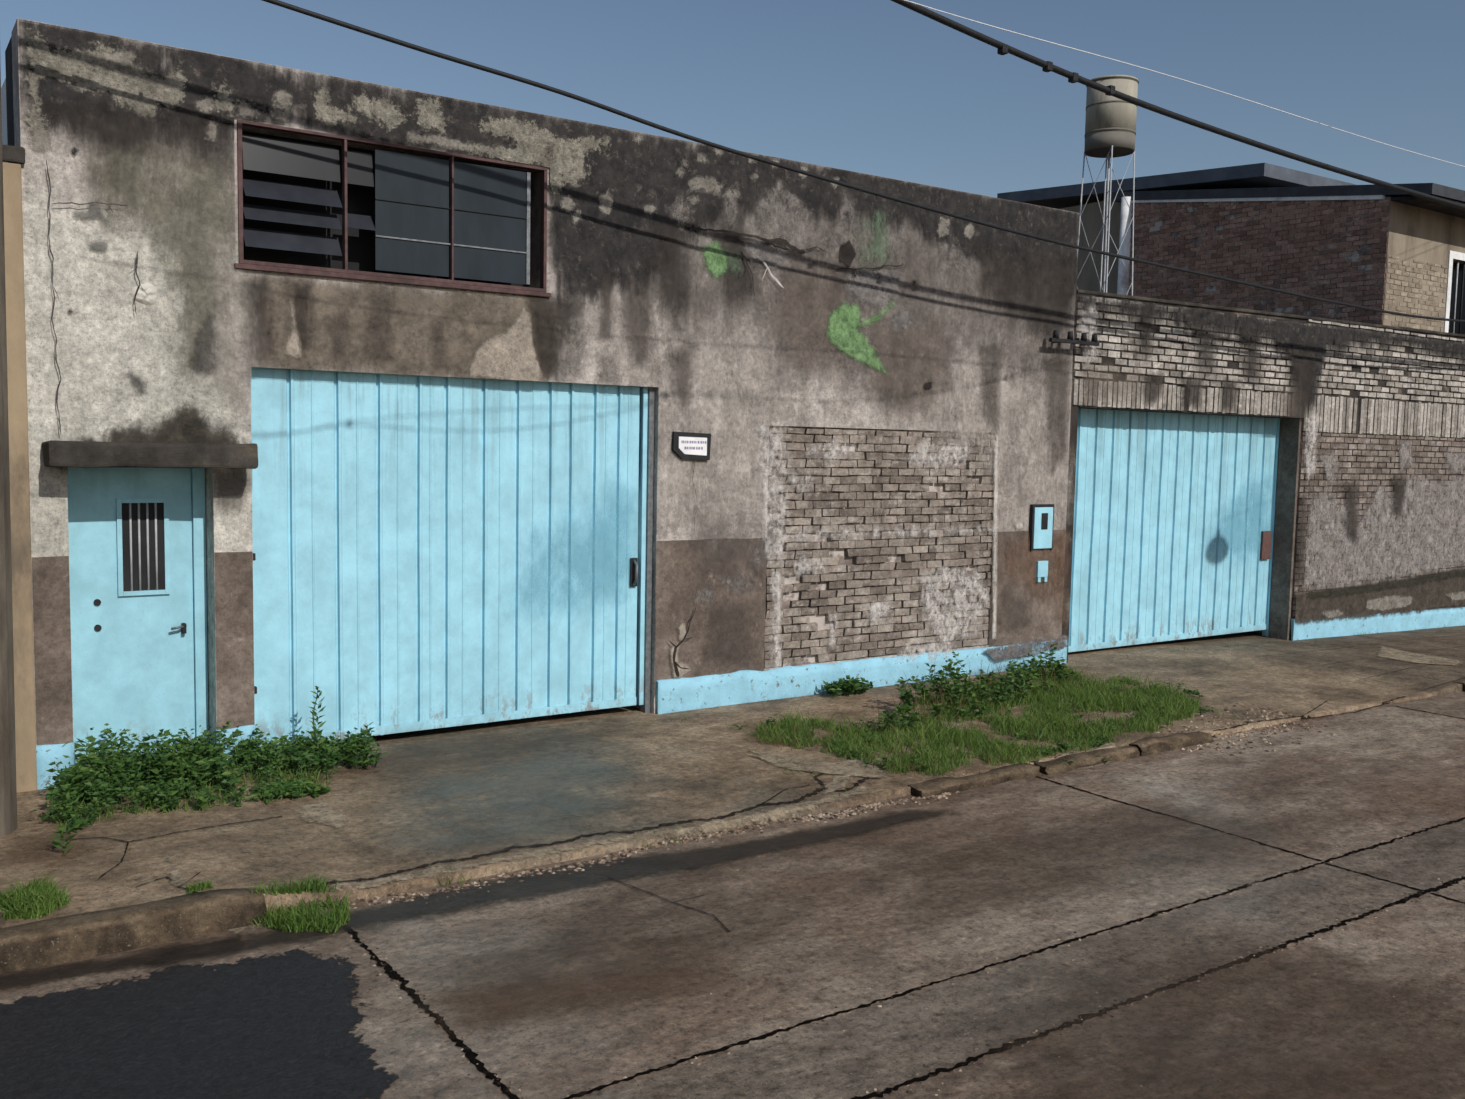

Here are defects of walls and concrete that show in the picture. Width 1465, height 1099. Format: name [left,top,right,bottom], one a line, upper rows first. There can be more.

crack [682,225,904,295]
damp [19,19,1465,665]
crack [670,607,696,677]